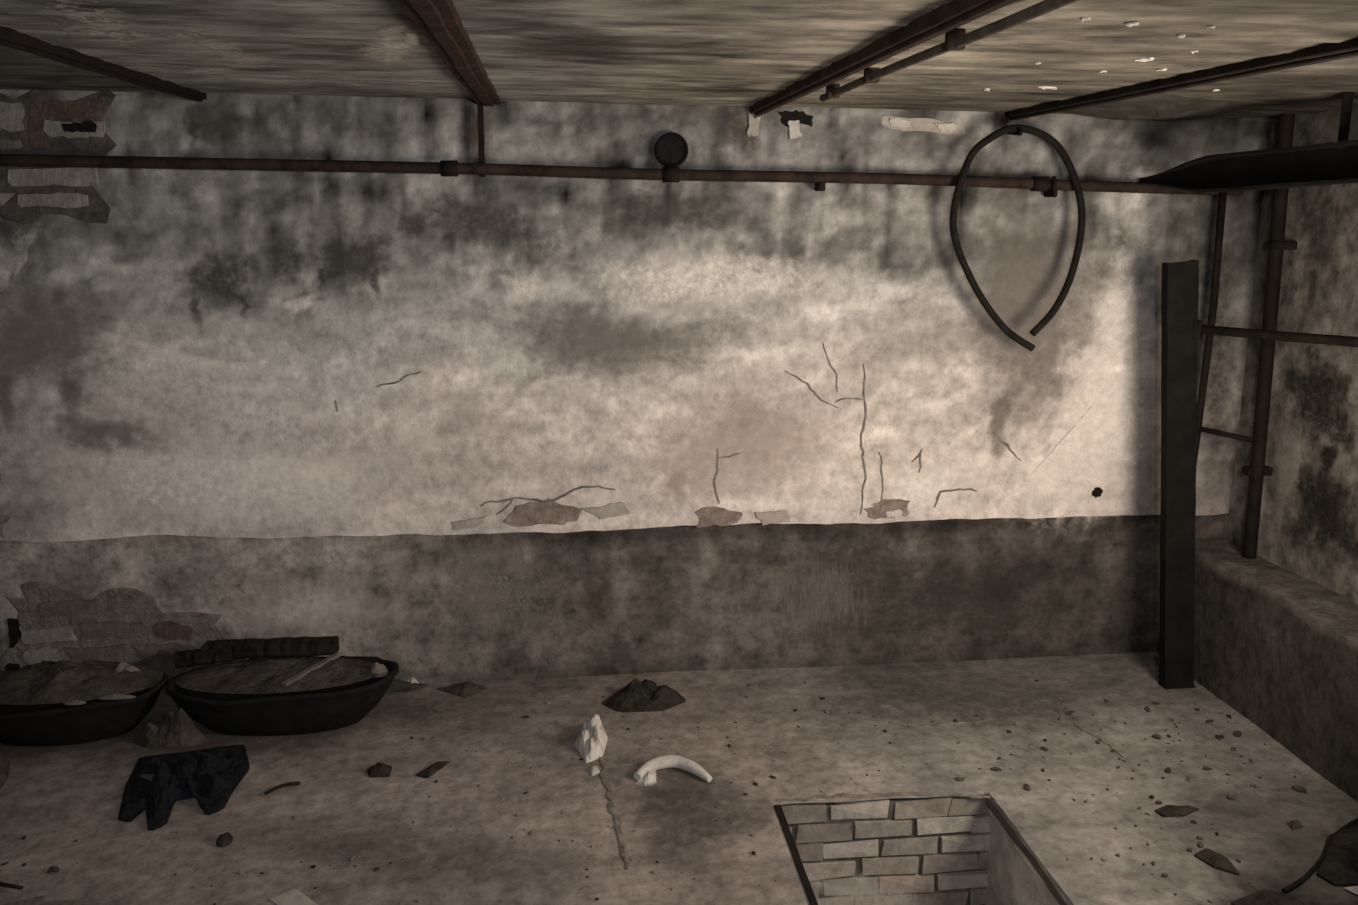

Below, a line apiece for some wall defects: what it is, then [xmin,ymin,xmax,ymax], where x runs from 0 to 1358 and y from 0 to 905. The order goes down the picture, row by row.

flaking render [0,90,117,224]
water stain [0,254,101,416]
water stain [67,422,396,522]
flaking render [452,515,488,530]
flaking render [503,498,631,527]
water stain [503,255,809,367]
crack [785,343,977,515]
water stain [883,468,969,511]
water stain [992,393,1013,446]
water stain [981,231,1098,396]
water stain [1036,250,1146,500]
water stain [1275,363,1358,560]